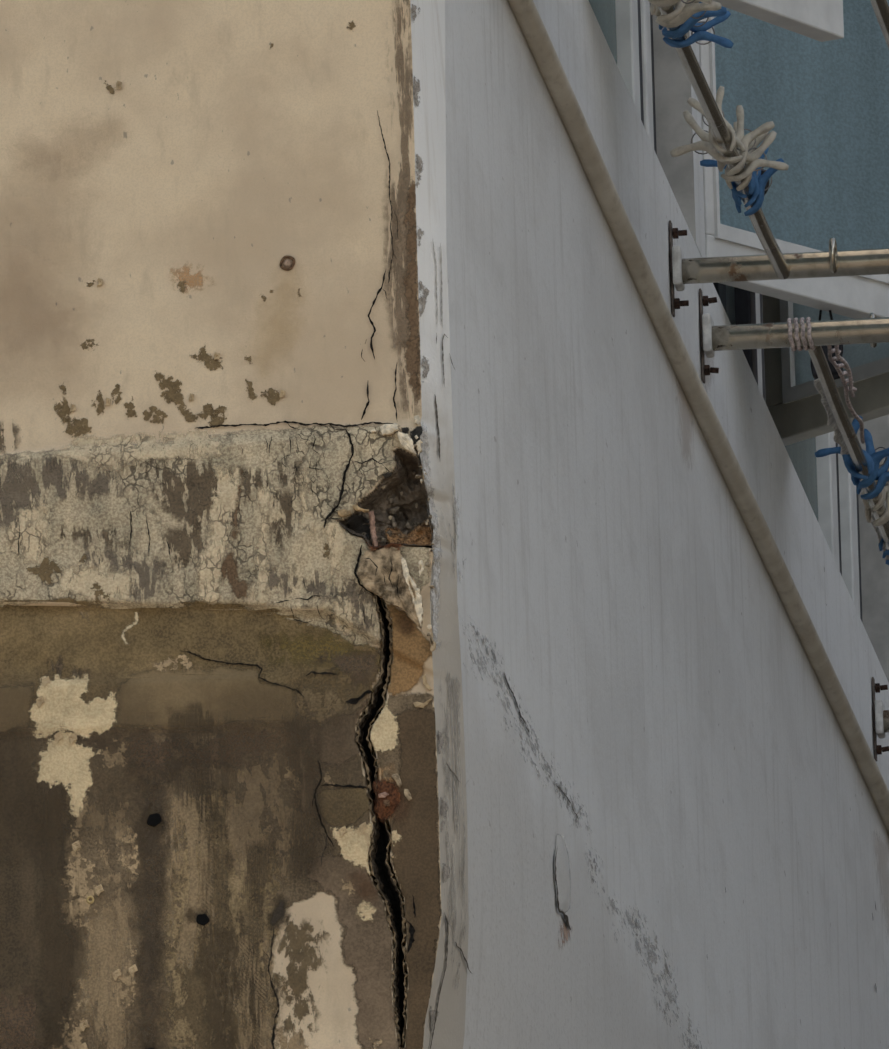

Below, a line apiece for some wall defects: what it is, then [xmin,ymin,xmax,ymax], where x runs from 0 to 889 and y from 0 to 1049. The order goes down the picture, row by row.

peeling [191,346,224,371]
crack [196,111,398,530]
peeling [403,154,429,402]
leakage [0,458,218,644]
peeling [0,373,441,767]
leakage [239,461,301,548]
crack [182,651,336,696]
flaking render [317,788,372,834]
crack [274,545,416,1047]
peeling [113,964,138,981]
flaking render [306,853,401,1049]
crack [430,912,471,1049]